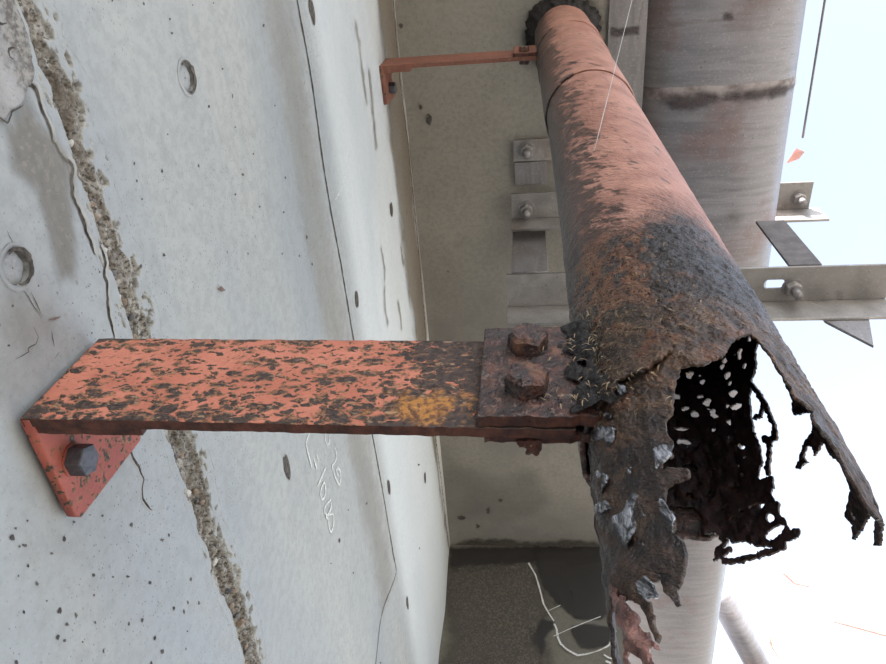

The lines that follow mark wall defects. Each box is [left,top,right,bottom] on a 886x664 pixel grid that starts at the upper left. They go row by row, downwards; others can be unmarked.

peeling [0,0,35,124]
crack [15,0,164,339]
crack [19,291,58,358]
crack [129,452,153,512]
crack [160,429,270,664]
peeling [659,498,675,531]